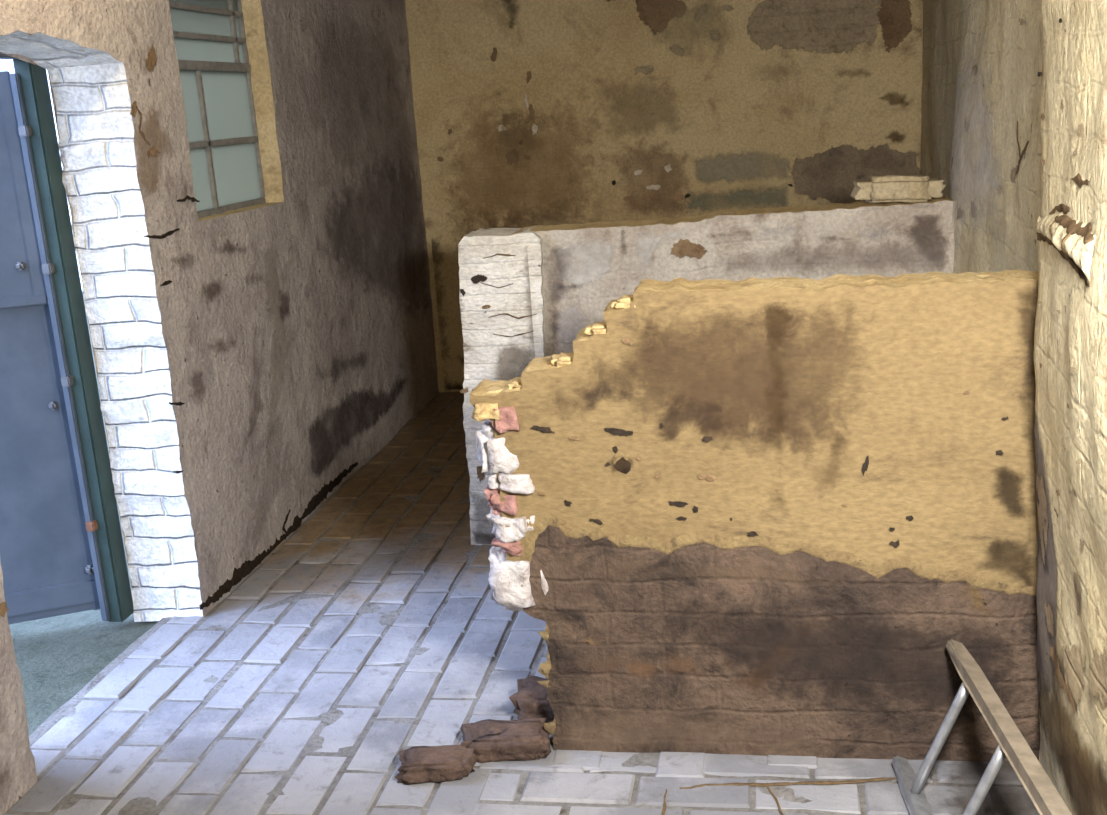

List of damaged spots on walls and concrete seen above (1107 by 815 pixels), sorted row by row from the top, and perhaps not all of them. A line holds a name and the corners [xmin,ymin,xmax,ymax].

flaking render [722,0,916,55]
flaking render [624,131,921,211]
crack [1010,121,1029,183]
crack [1037,173,1095,287]
flaking render [460,274,487,297]
water stain [1023,295,1036,351]
peeling [498,348,529,381]
water stain [628,311,828,448]
water stain [309,380,405,475]
water stain [998,470,1022,515]
water stain [990,542,1026,579]
flaking render [395,403,1107,785]